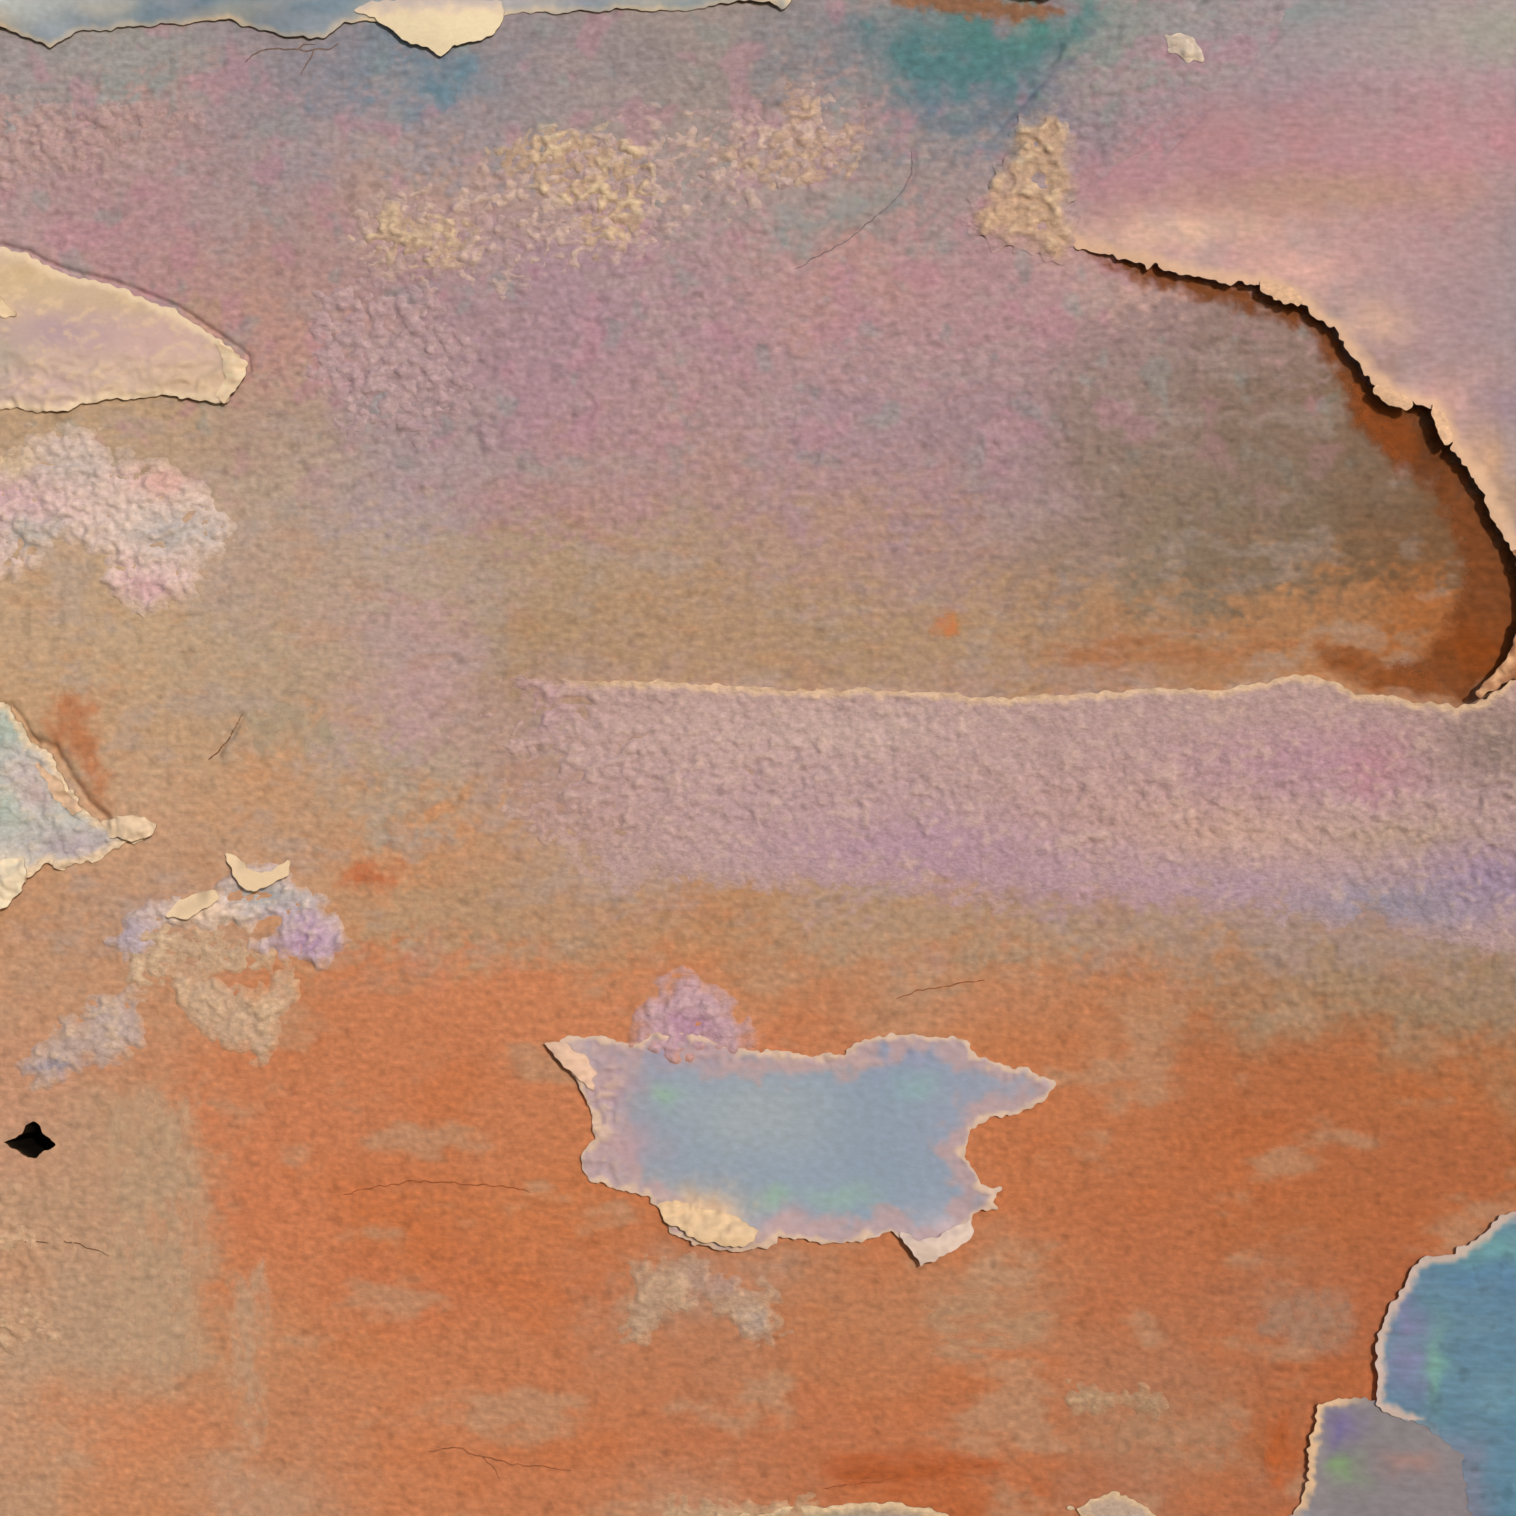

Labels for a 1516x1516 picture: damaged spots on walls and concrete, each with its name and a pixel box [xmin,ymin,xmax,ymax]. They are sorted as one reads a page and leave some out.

peeling [0,0,792,57]
spalling [0,247,248,618]
spalling [300,75,872,458]
flaking render [960,0,1516,568]
rust [1098,254,1516,701]
peeling [0,702,157,909]
spalling [479,634,1516,955]
spalling [14,853,352,1092]
peeling [544,965,1057,1348]
spalling [661,1492,949,1516]
peeling [1067,1491,1156,1516]
peeling [1288,1211,1516,1516]